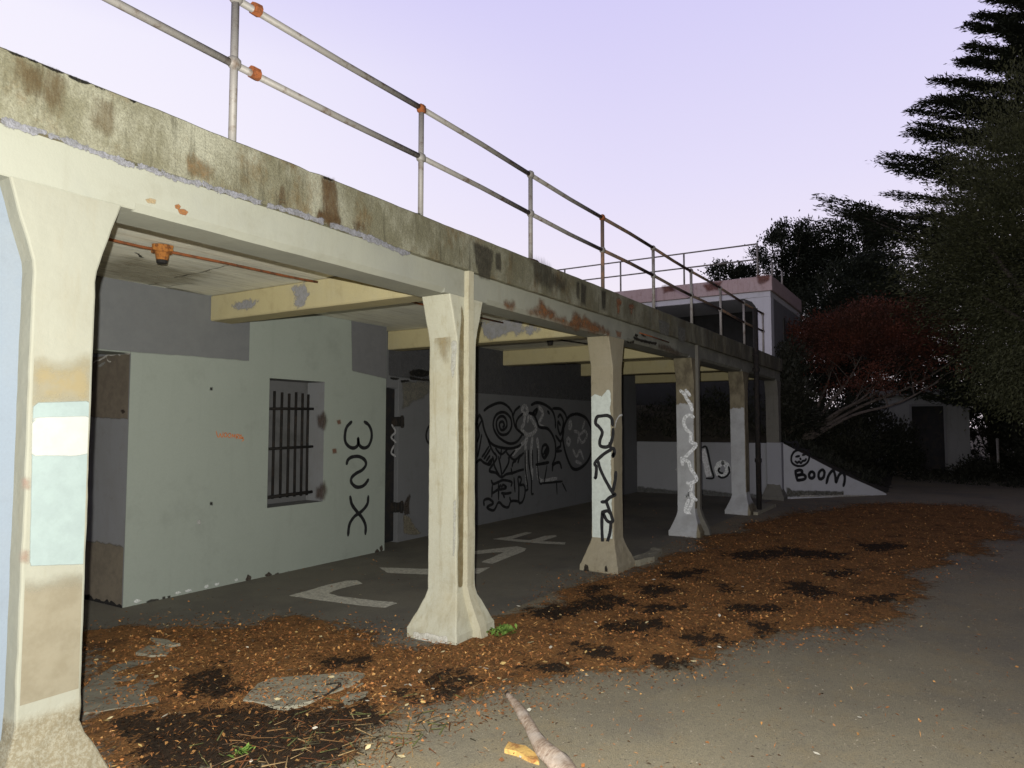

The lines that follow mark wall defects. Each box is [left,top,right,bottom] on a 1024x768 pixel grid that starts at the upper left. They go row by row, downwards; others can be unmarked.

peeling [1,117,411,256]
water stain [474,243,501,279]
peeling [291,285,309,307]
peeling [480,320,540,340]
rust [531,300,621,337]